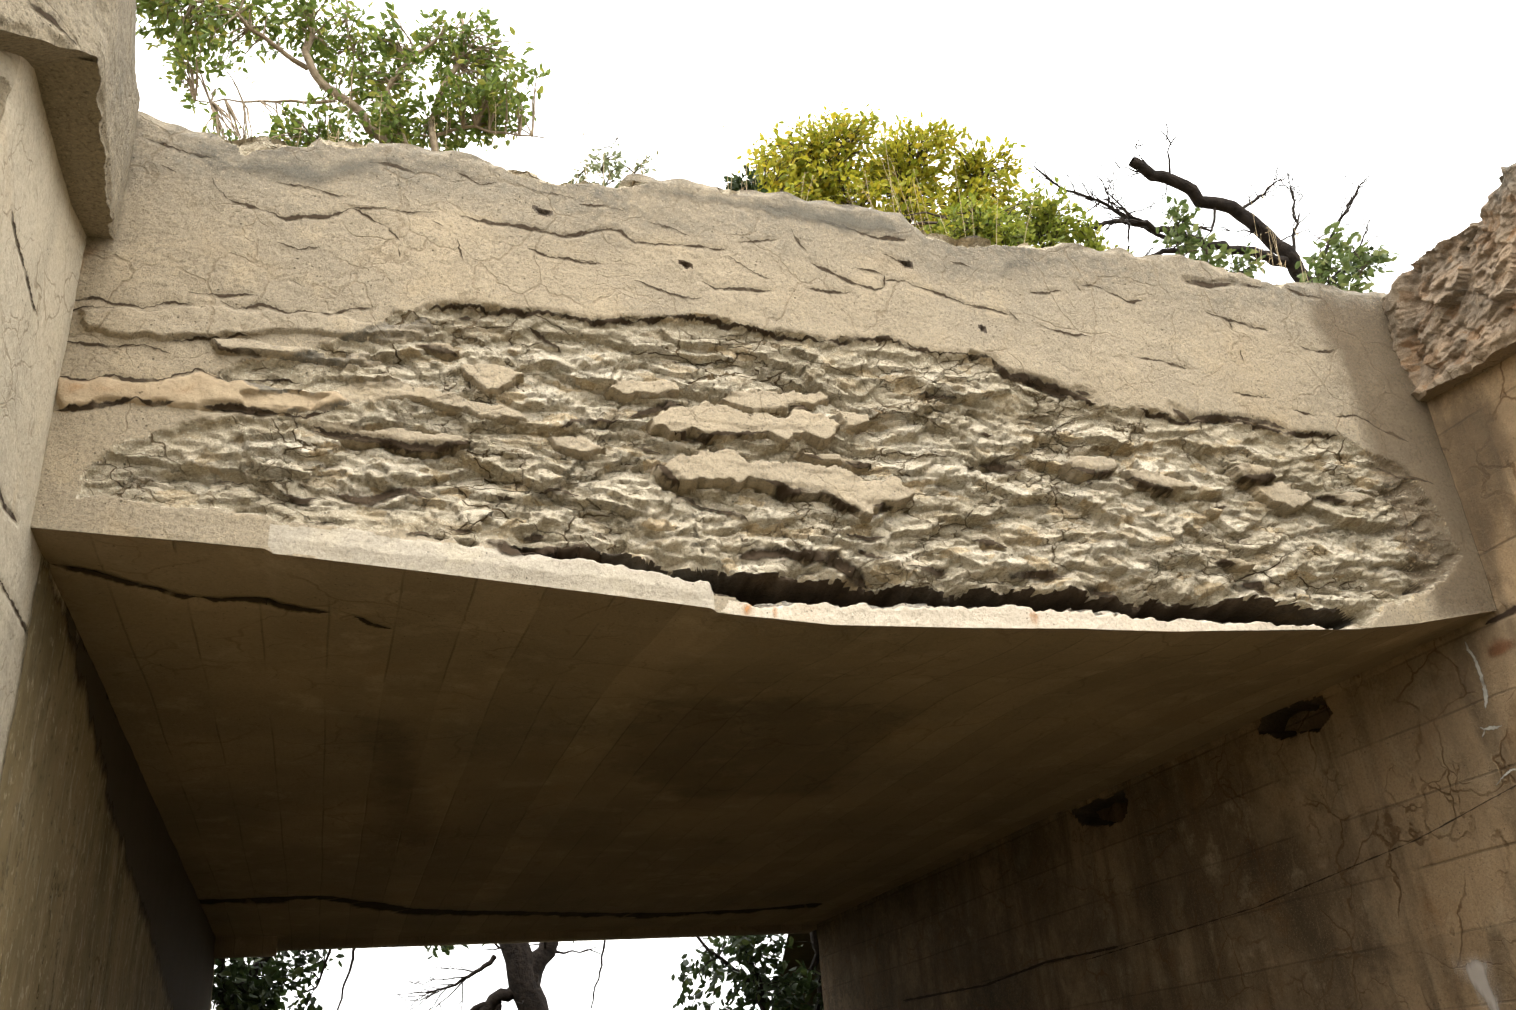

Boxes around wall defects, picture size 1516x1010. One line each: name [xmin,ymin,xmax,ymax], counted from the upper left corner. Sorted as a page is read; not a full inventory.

crack [12,210,37,314]
crack [57,138,1142,596]
crack [1138,280,1433,484]
spalling [55,302,1463,636]
crack [1070,467,1173,498]
crack [1213,473,1276,509]
crack [1316,496,1346,504]
crack [52,564,391,629]
crack [1214,559,1270,595]
spalling [1258,695,1333,740]
spalling [1072,790,1128,828]
damp [1467,961,1497,1010]